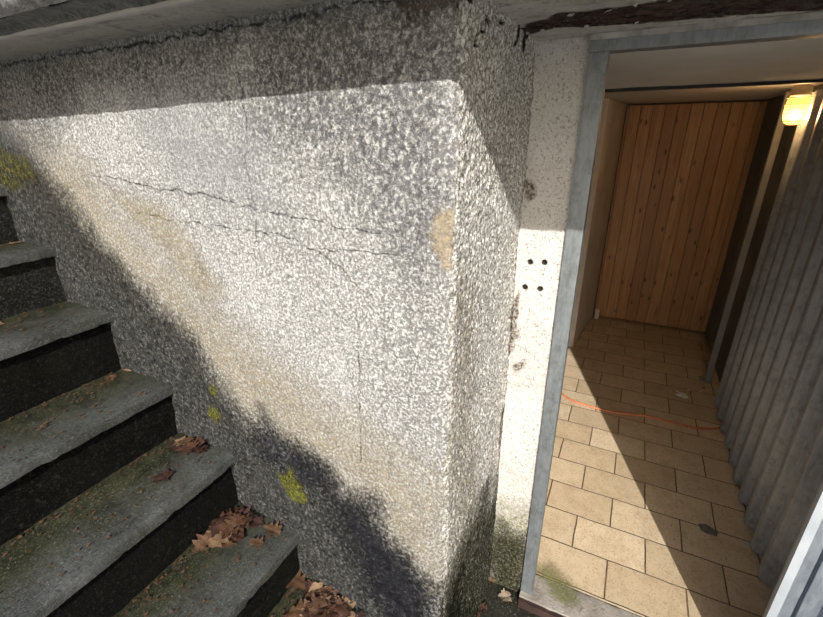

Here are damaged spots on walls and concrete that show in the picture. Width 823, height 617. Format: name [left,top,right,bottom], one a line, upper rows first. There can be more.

peeling [521,0,823,35]
crack [89,81,402,313]
damp [0,15,454,617]